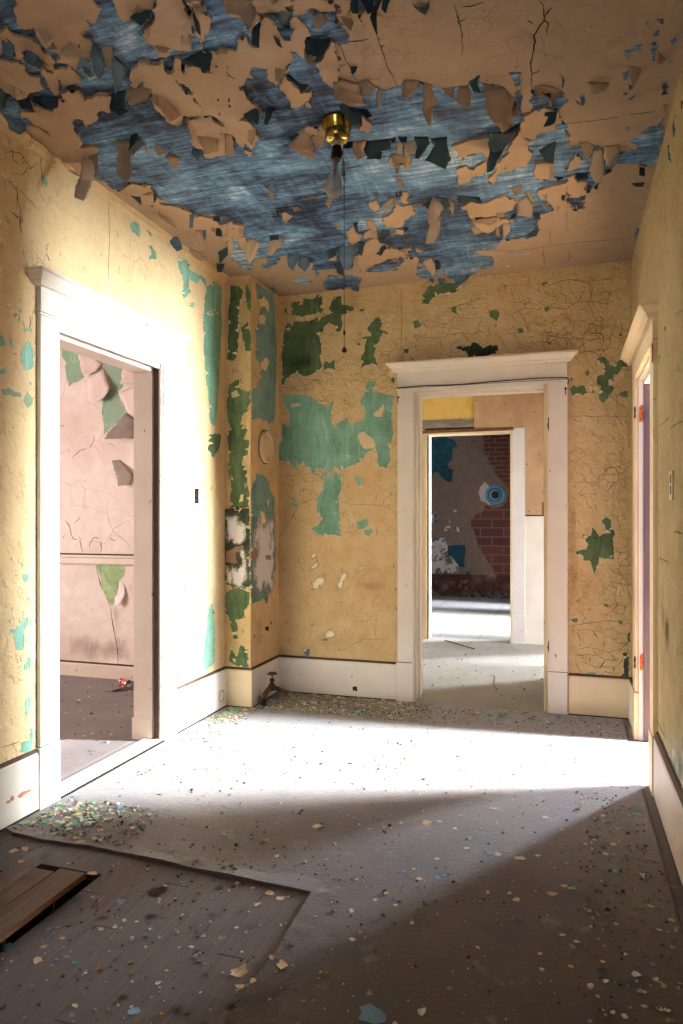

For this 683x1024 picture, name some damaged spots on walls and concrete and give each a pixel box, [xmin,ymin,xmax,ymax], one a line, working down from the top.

crack [455,2,483,53]
crack [527,1,552,90]
peeling [0,0,683,677]
crack [385,212,626,380]
crack [63,519,118,660]
crack [573,620,627,674]
peeling [19,728,33,753]